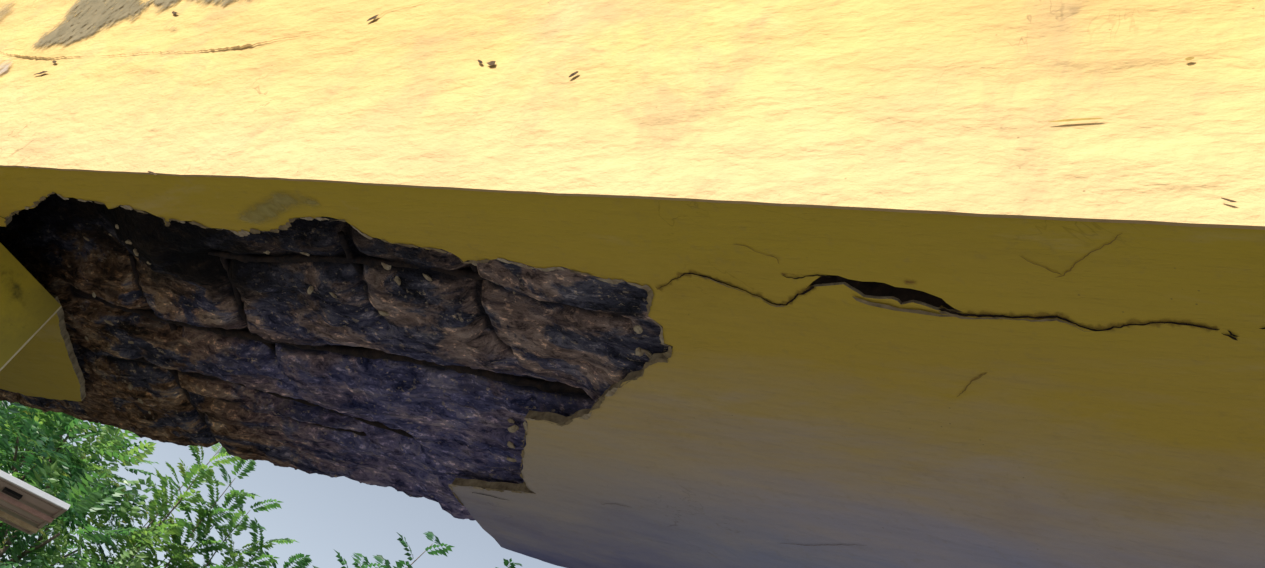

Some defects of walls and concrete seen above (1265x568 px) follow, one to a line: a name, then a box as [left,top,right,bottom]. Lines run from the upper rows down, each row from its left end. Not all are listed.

crack [656,244,1265,341]
crack [1019,233,1122,277]
spalling [0,192,673,521]